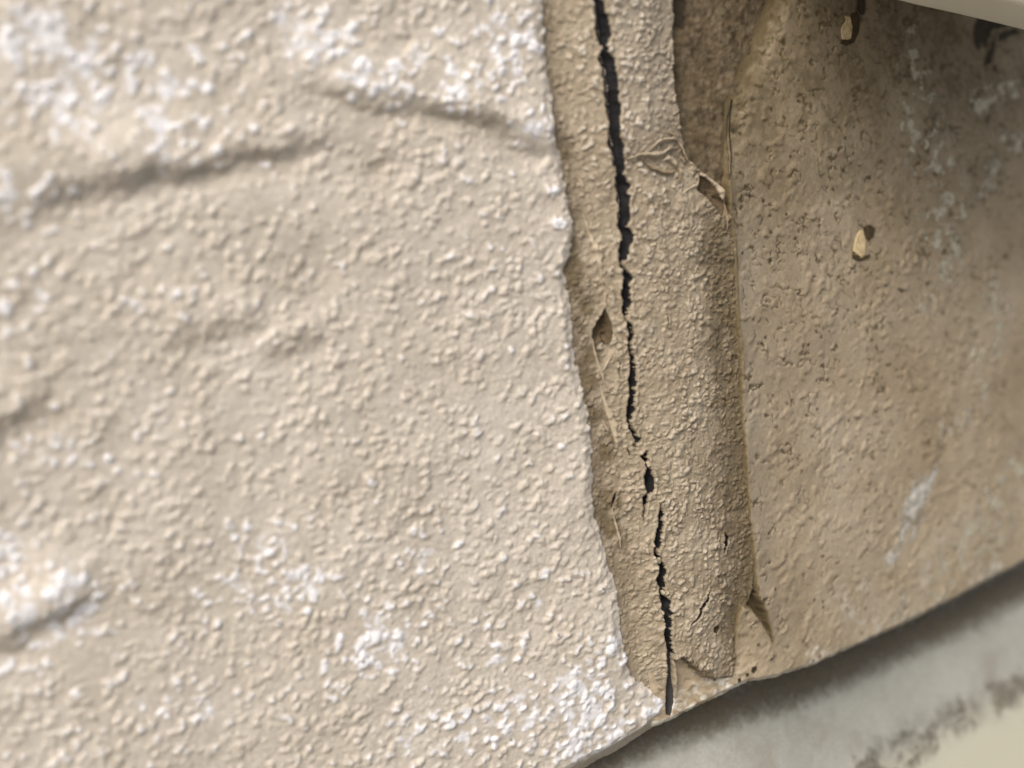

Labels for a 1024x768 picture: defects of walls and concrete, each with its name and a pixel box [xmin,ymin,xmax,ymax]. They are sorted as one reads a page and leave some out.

peeling [626,132,737,255]
peeling [591,338,619,449]
crack [593,0,710,716]